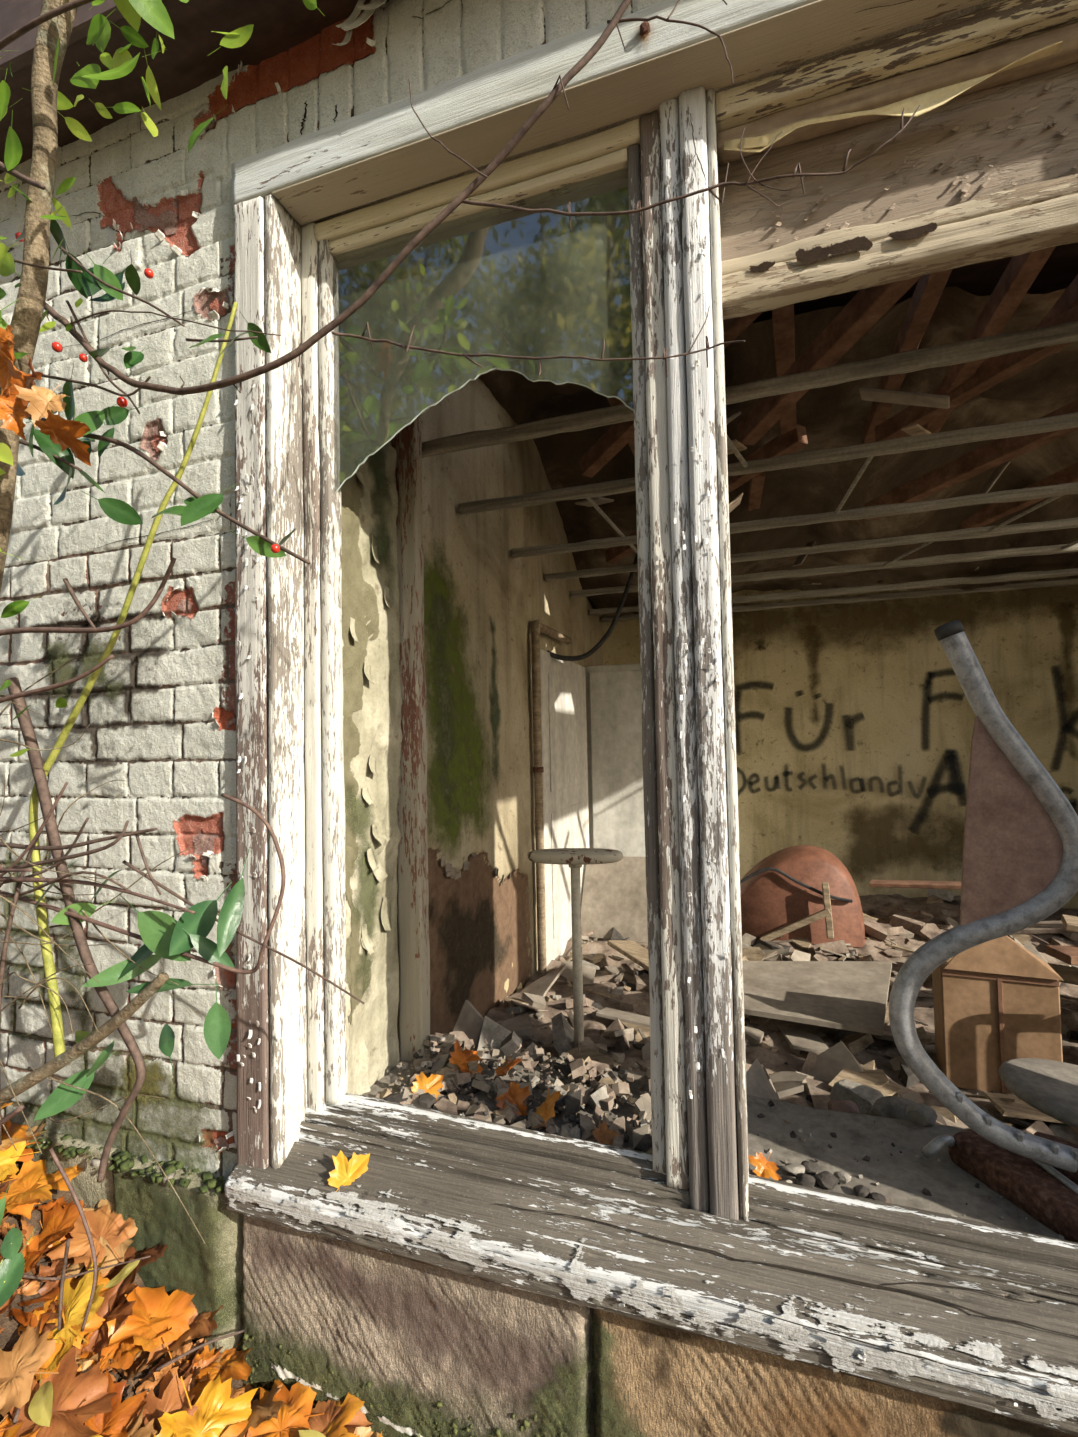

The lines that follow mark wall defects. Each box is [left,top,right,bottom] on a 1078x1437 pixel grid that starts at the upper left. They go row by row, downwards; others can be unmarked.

spalling [193,0,387,140]
peeling [724,41,1072,243]
spalling [96,171,205,256]
spalling [192,287,229,322]
spalling [16,575,199,767]
peeling [676,633,720,682]
spalling [173,812,225,882]
peeling [236,1021,261,1113]
damp [263,1240,568,1386]
peeling [226,1170,1078,1422]
damp [642,1322,700,1386]
damp [942,1407,1077,1437]